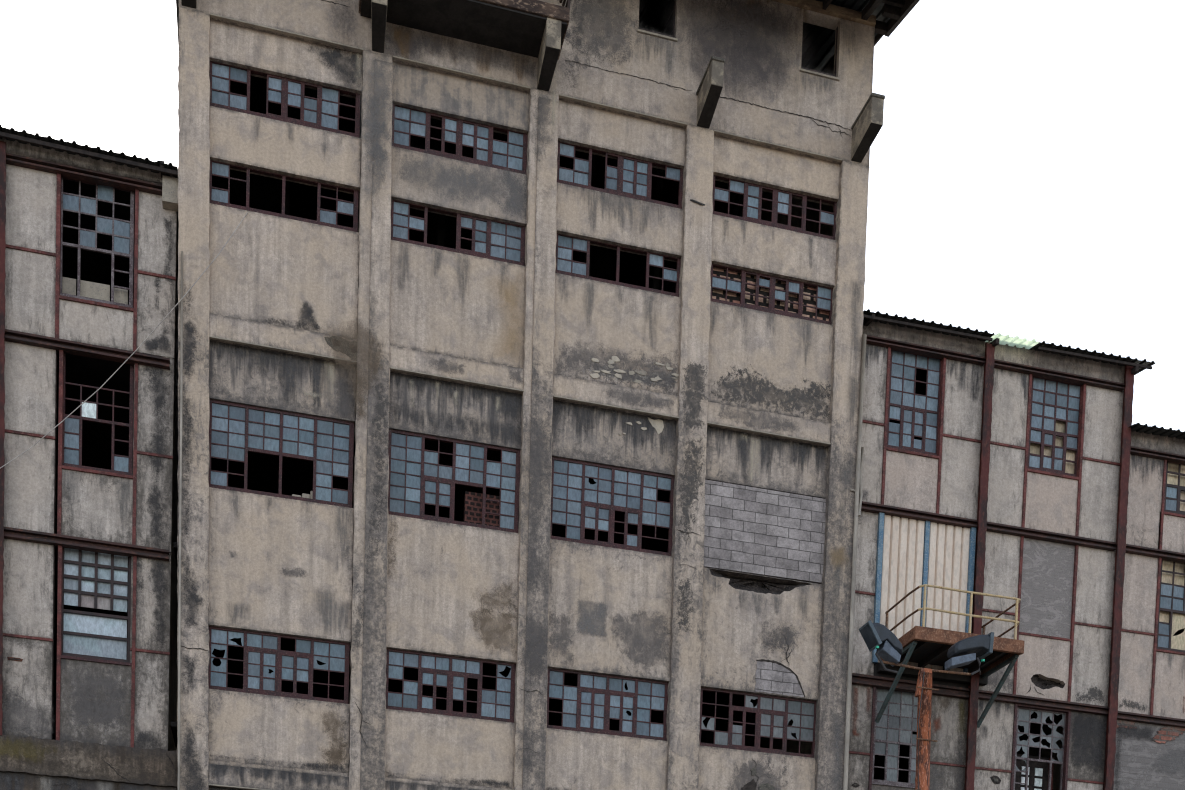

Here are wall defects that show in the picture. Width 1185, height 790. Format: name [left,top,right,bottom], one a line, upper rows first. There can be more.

leakage [183,321,198,379]
peeling [589,356,679,386]
leakage [146,366,167,545]
leakage [215,302,549,587]
leakage [677,408,825,543]
leakage [136,558,167,645]
leakage [473,576,694,674]
spalling [709,569,812,595]
spalling [755,659,805,698]
spalling [1031,674,1065,690]
leakage [182,715,345,790]
spalling [741,767,775,790]